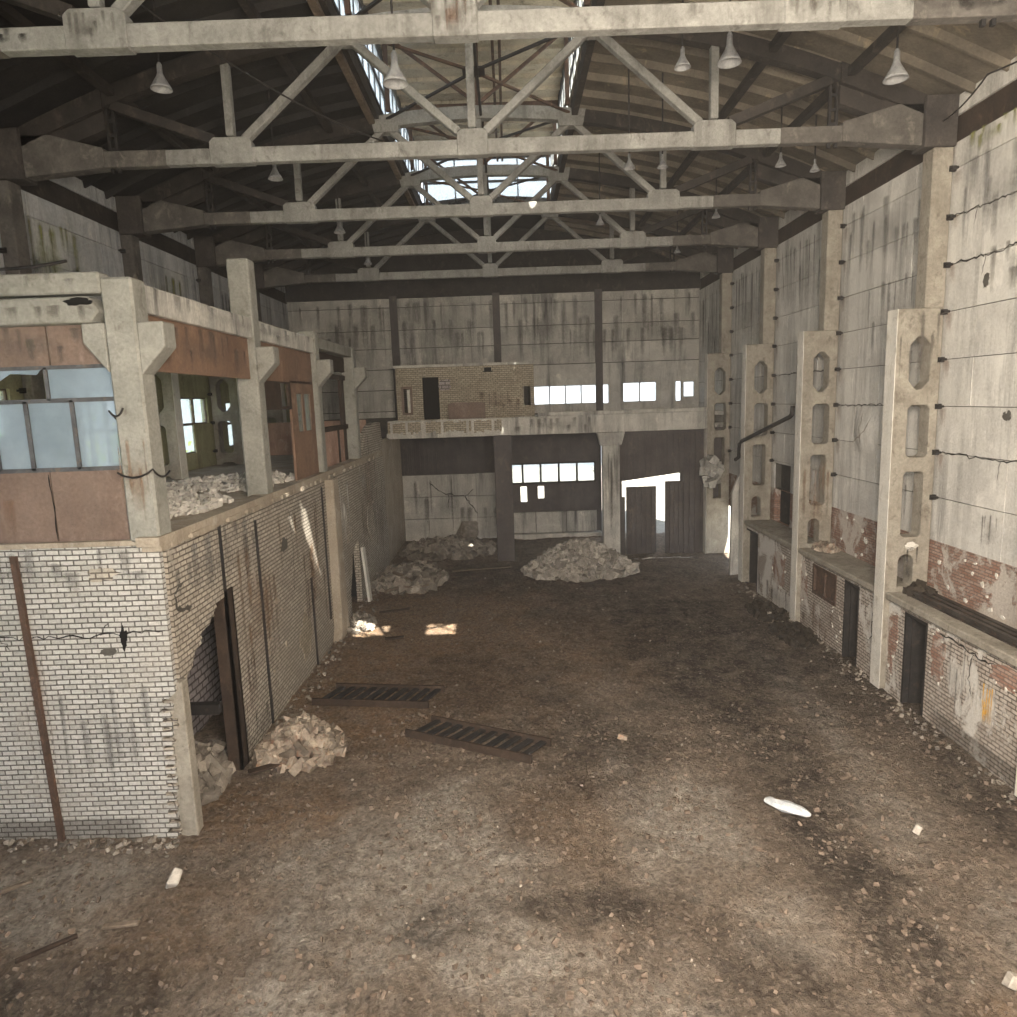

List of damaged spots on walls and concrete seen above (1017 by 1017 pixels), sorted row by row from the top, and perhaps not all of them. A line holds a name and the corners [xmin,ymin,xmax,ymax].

peeling [935,556,1017,629]